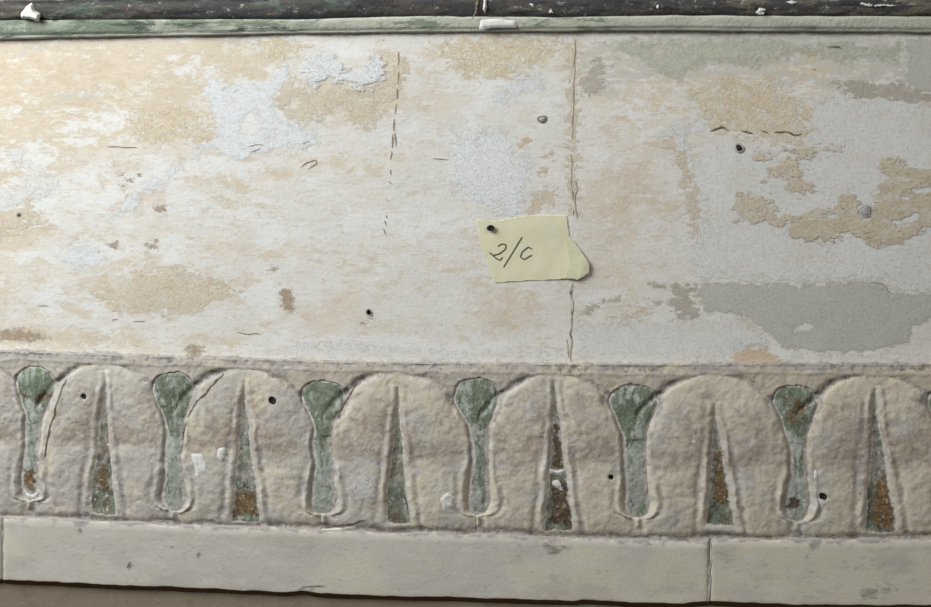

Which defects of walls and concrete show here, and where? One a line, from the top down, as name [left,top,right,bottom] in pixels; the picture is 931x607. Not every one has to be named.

crack [383,53,399,234]
peeling [263,32,931,363]